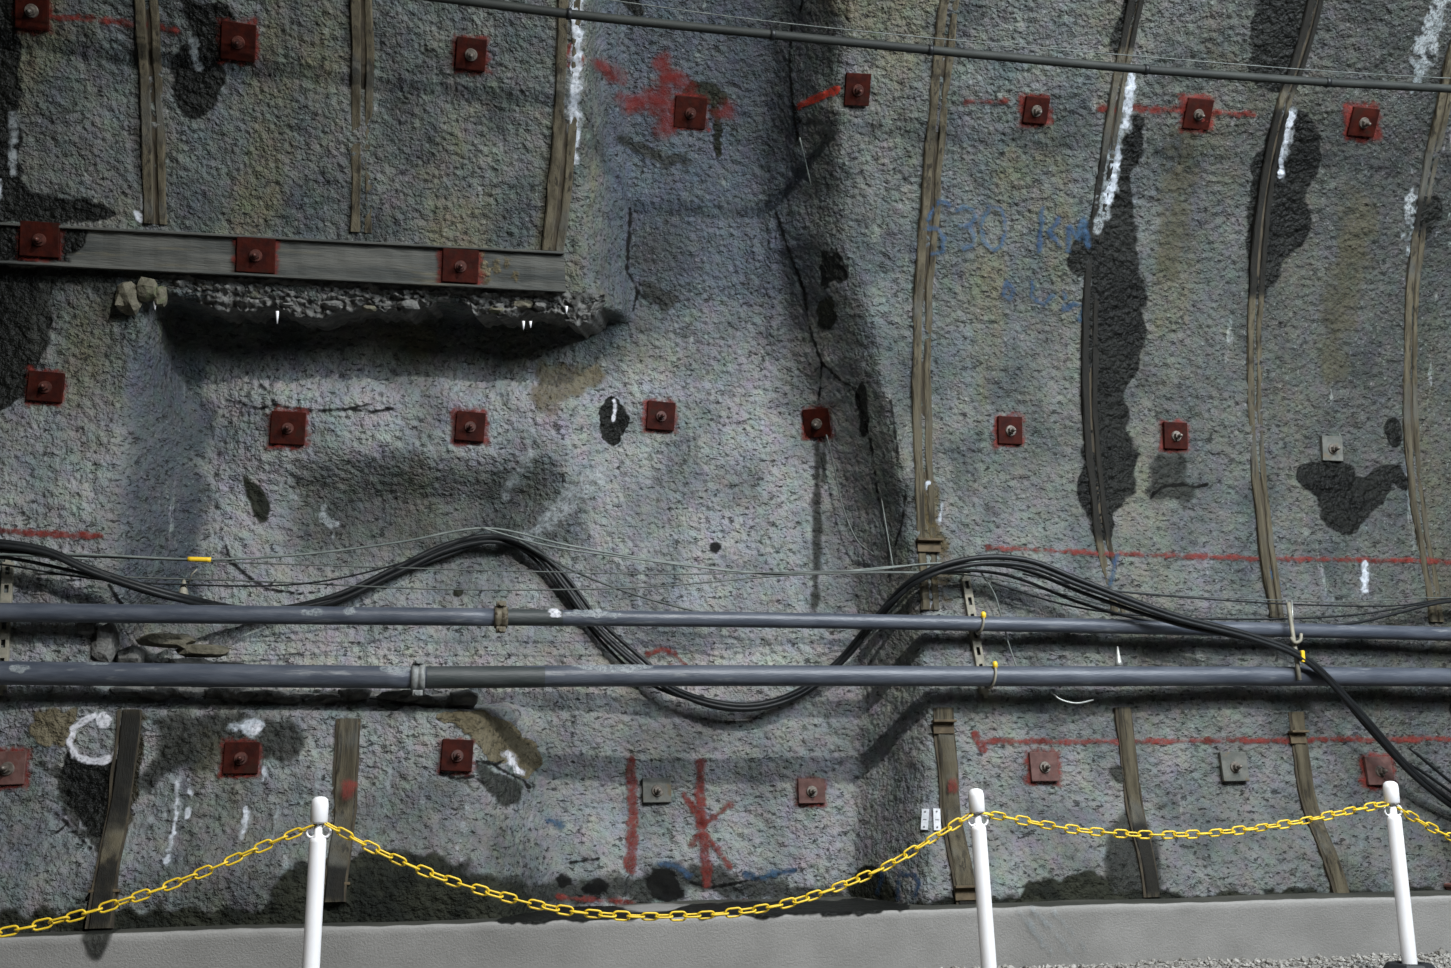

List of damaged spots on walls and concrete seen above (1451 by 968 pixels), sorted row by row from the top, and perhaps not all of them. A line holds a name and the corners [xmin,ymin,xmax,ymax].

damp [170,0,235,119]
damp [1110,0,1138,56]
damp [0,0,117,411]
damp [1246,0,1322,299]
spalling [155,274,609,339]
damp [1067,73,1194,540]
crack [775,211,908,546]
damp [1296,417,1408,535]
damp [0,849,955,959]
damp [992,814,1318,941]